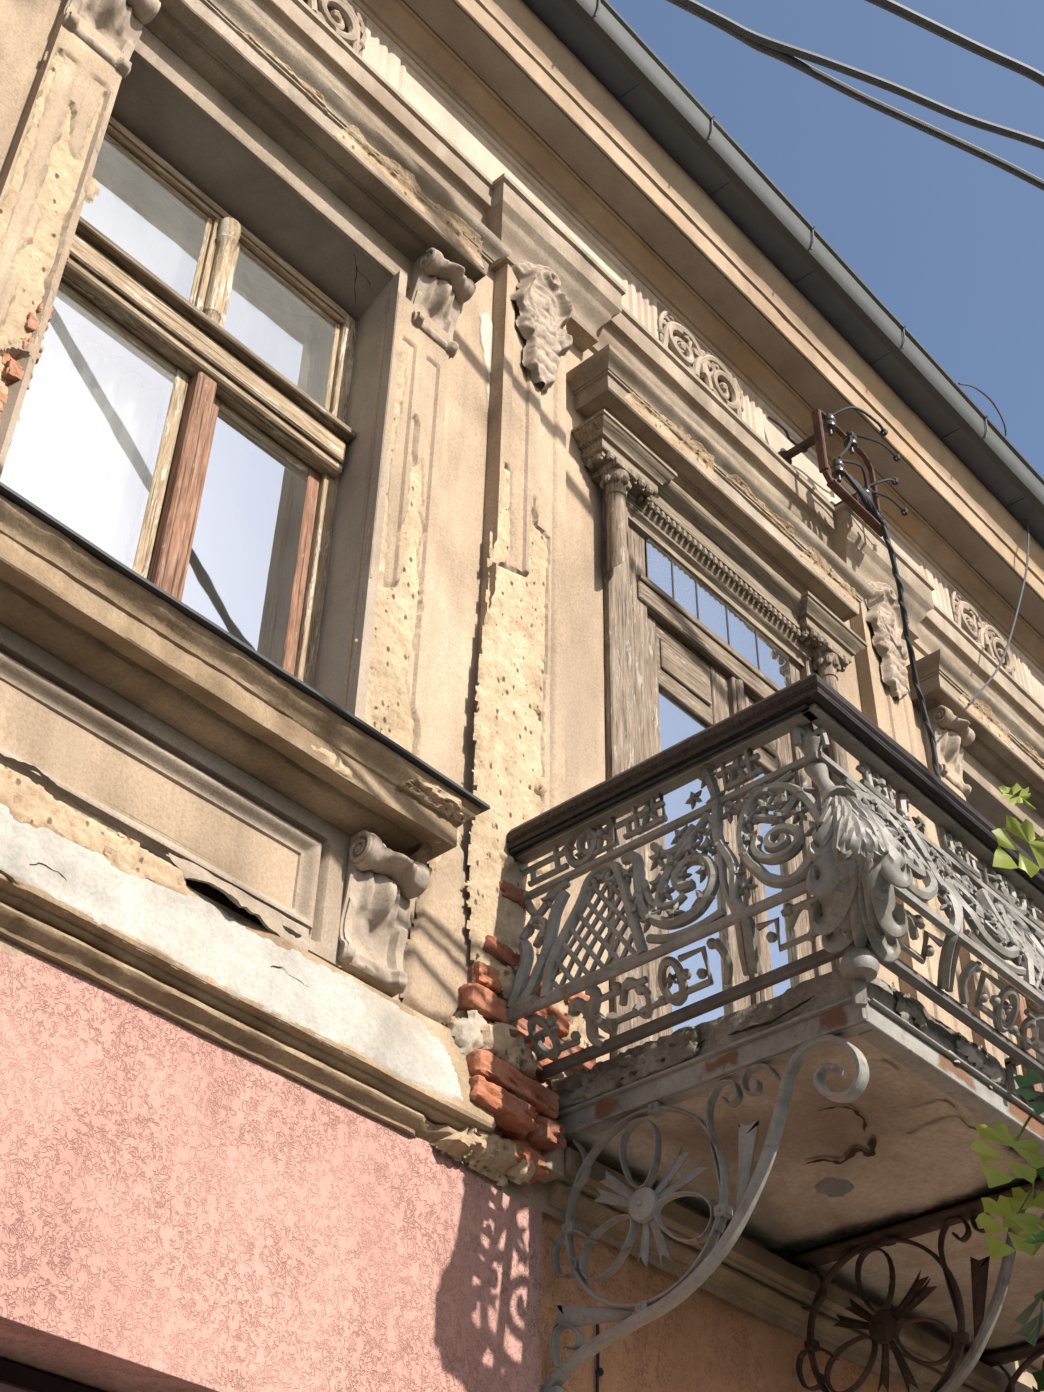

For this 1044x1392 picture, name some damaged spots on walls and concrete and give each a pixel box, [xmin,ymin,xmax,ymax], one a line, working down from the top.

flaking render [0,51,104,422]
flaking render [352,354,422,753]
flaking render [0,763,188,897]
flaking render [311,745,354,783]
flaking render [398,468,701,1188]
crack [807,1106,877,1164]